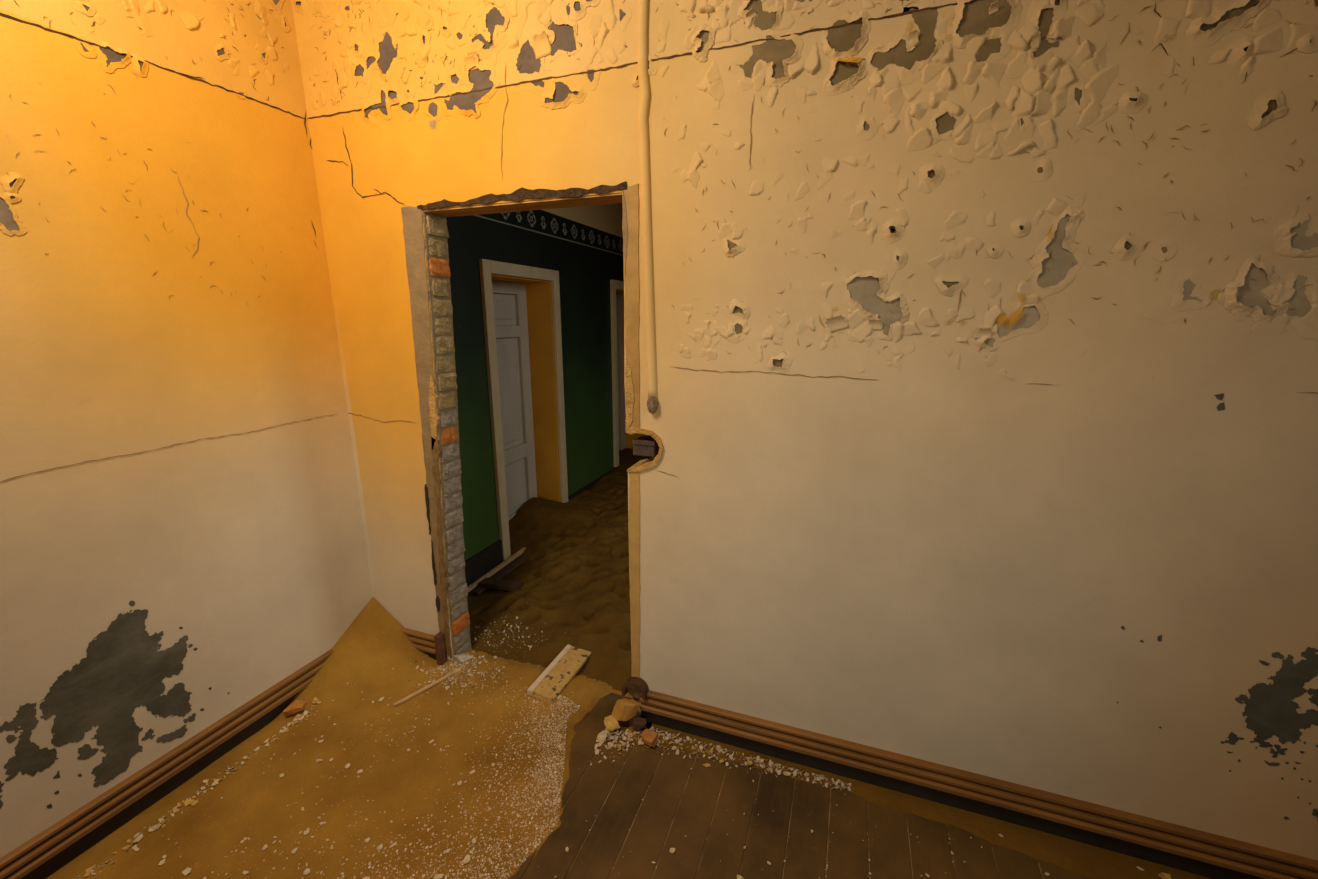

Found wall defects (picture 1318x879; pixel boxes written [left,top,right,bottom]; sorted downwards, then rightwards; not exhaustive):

peeling [351,0,632,128]
peeling [728,0,822,88]
peeling [821,0,1067,96]
crack [1068,3,1209,221]
peeling [1185,0,1271,70]
crack [0,0,978,380]
peeling [825,217,909,341]
crack [976,207,1167,282]
crack [1209,139,1311,312]
crack [0,413,414,482]
peeling [0,601,204,809]
peeling [1221,647,1318,782]